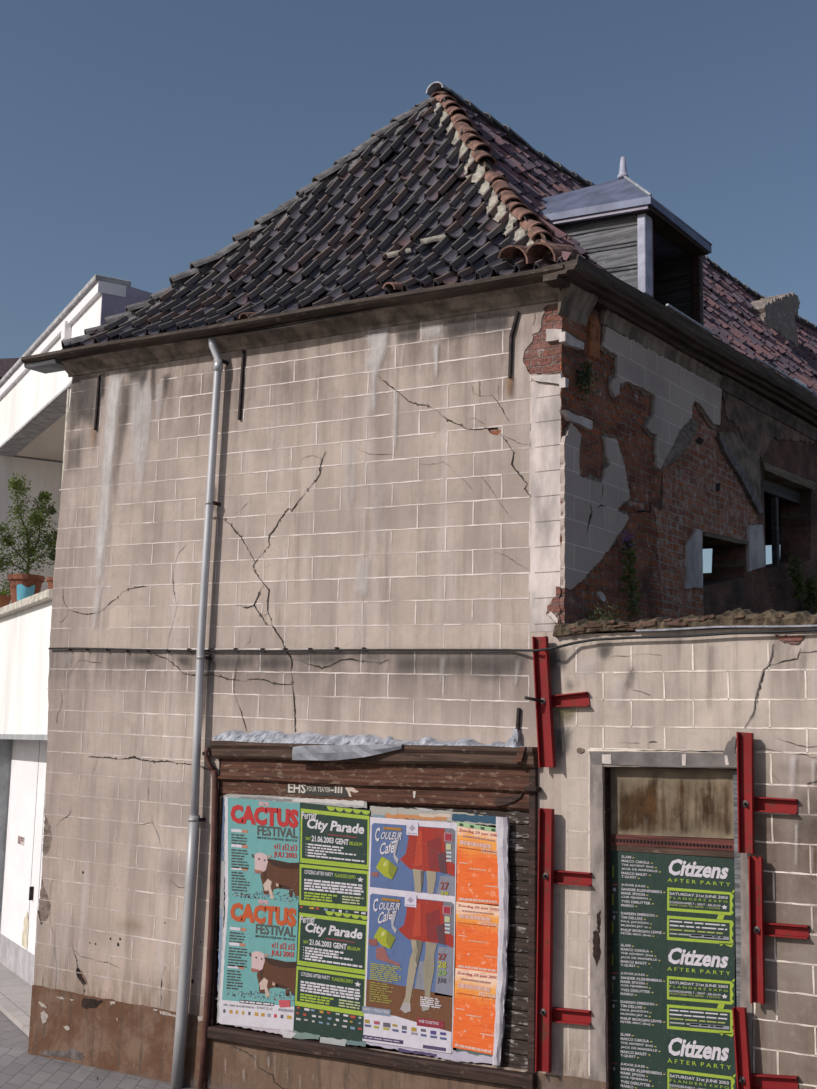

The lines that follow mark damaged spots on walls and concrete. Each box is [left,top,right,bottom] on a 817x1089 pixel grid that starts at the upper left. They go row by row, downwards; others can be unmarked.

damp [72,368,167,612]
crack [380,378,531,497]
flaking render [523,304,759,624]
crack [61,586,146,622]
crack [154,451,389,731]
flaking render [775,635,805,644]
crack [89,756,209,783]
crack [745,643,817,784]
flaking render [57,968,116,1009]